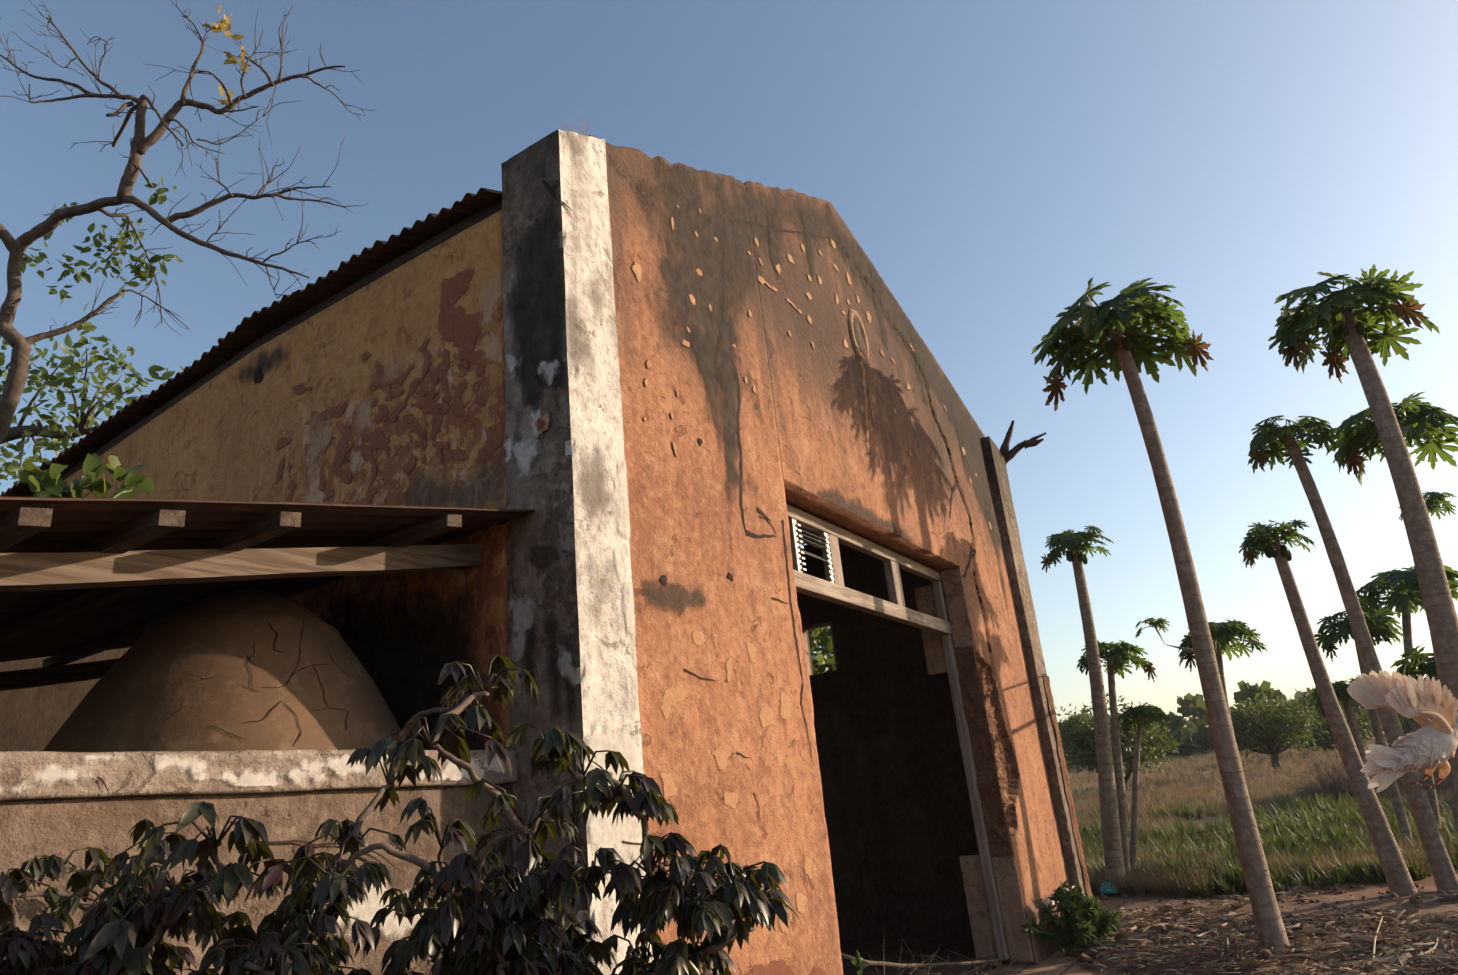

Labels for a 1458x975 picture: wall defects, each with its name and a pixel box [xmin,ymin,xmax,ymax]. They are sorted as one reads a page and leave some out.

water stain [508,184,581,414]
peeling [275,268,549,507]
peeling [538,361,557,384]
water stain [650,159,1007,604]
crack [715,257,814,763]
crack [161,619,348,761]
peeling [510,598,532,661]
water stain [524,616,573,721]
peeling [558,652,575,683]
spalling [954,647,1020,857]
peeling [779,854,813,935]
peeling [745,959,827,975]